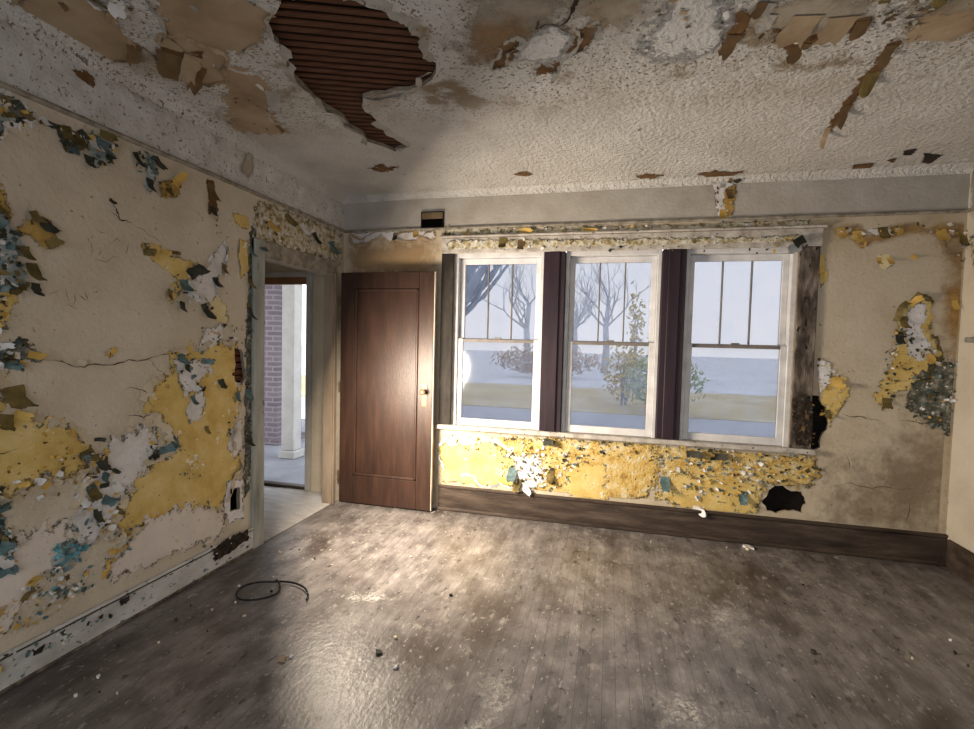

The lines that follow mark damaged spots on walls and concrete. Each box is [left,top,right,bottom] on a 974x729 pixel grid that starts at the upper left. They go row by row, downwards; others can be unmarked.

crack [535,0,579,30]
peeling [0,88,119,168]
peeling [132,150,189,198]
peeling [11,0,436,148]
peeling [819,39,901,150]
peeling [0,170,850,638]
peeling [873,292,959,448]
peeling [0,614,112,677]